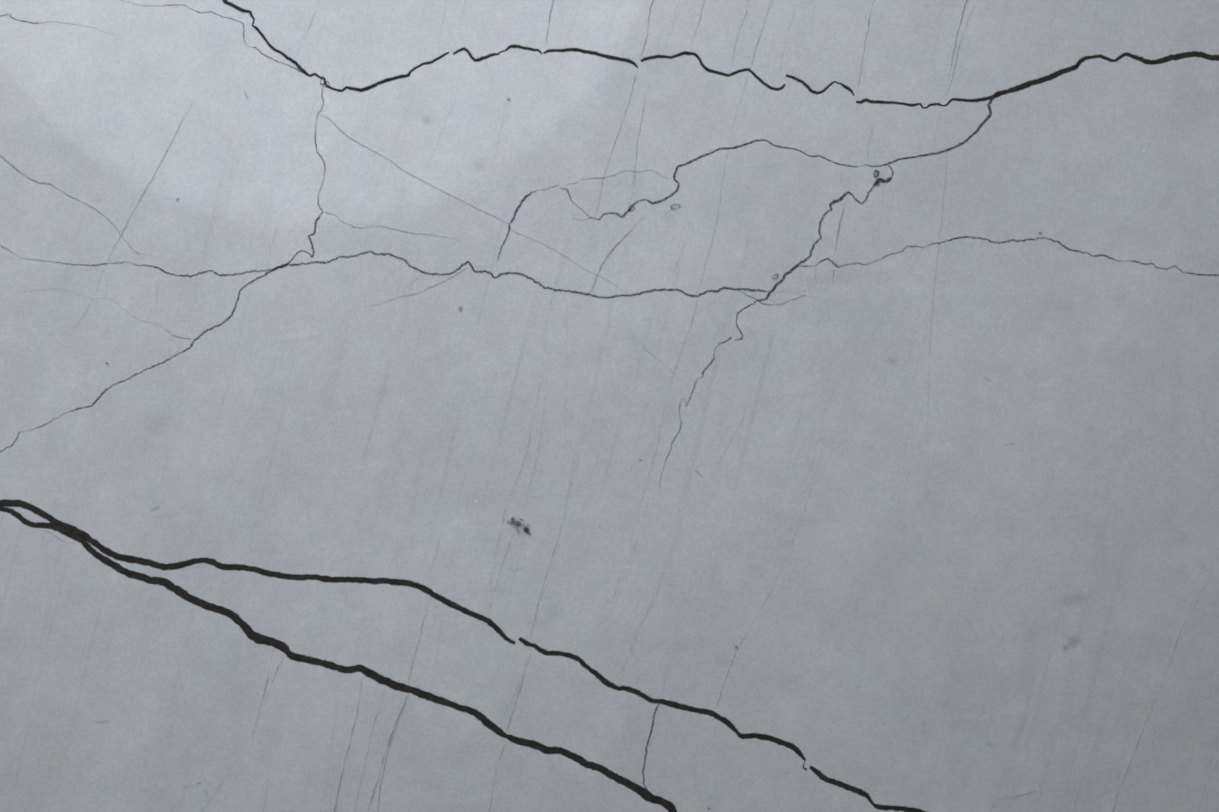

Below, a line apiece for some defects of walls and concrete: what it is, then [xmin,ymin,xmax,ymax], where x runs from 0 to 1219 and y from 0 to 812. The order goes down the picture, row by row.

crack [75,0,1219,410]
crack [0,499,926,812]